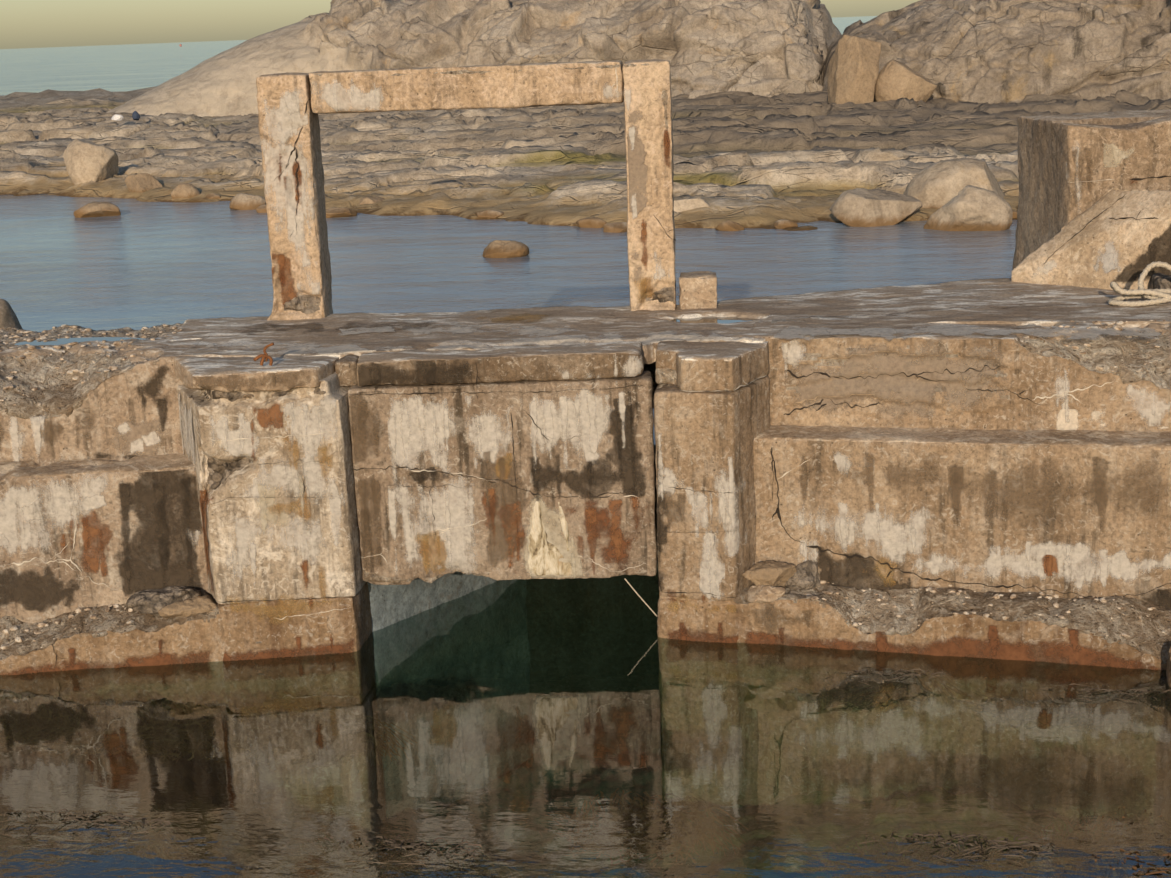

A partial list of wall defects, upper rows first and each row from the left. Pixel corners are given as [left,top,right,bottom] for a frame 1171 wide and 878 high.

crack [274,85,311,237]
corrosion [253,343,274,366]
crack [735,365,1112,415]
corrosion [251,404,299,466]
leakage [193,322,752,599]
corrosion [62,512,111,576]
corrosion [482,453,525,568]
corrosion [566,497,639,571]
crack [770,447,1166,599]
leakage [0,567,79,612]
corrosion [668,596,1162,670]